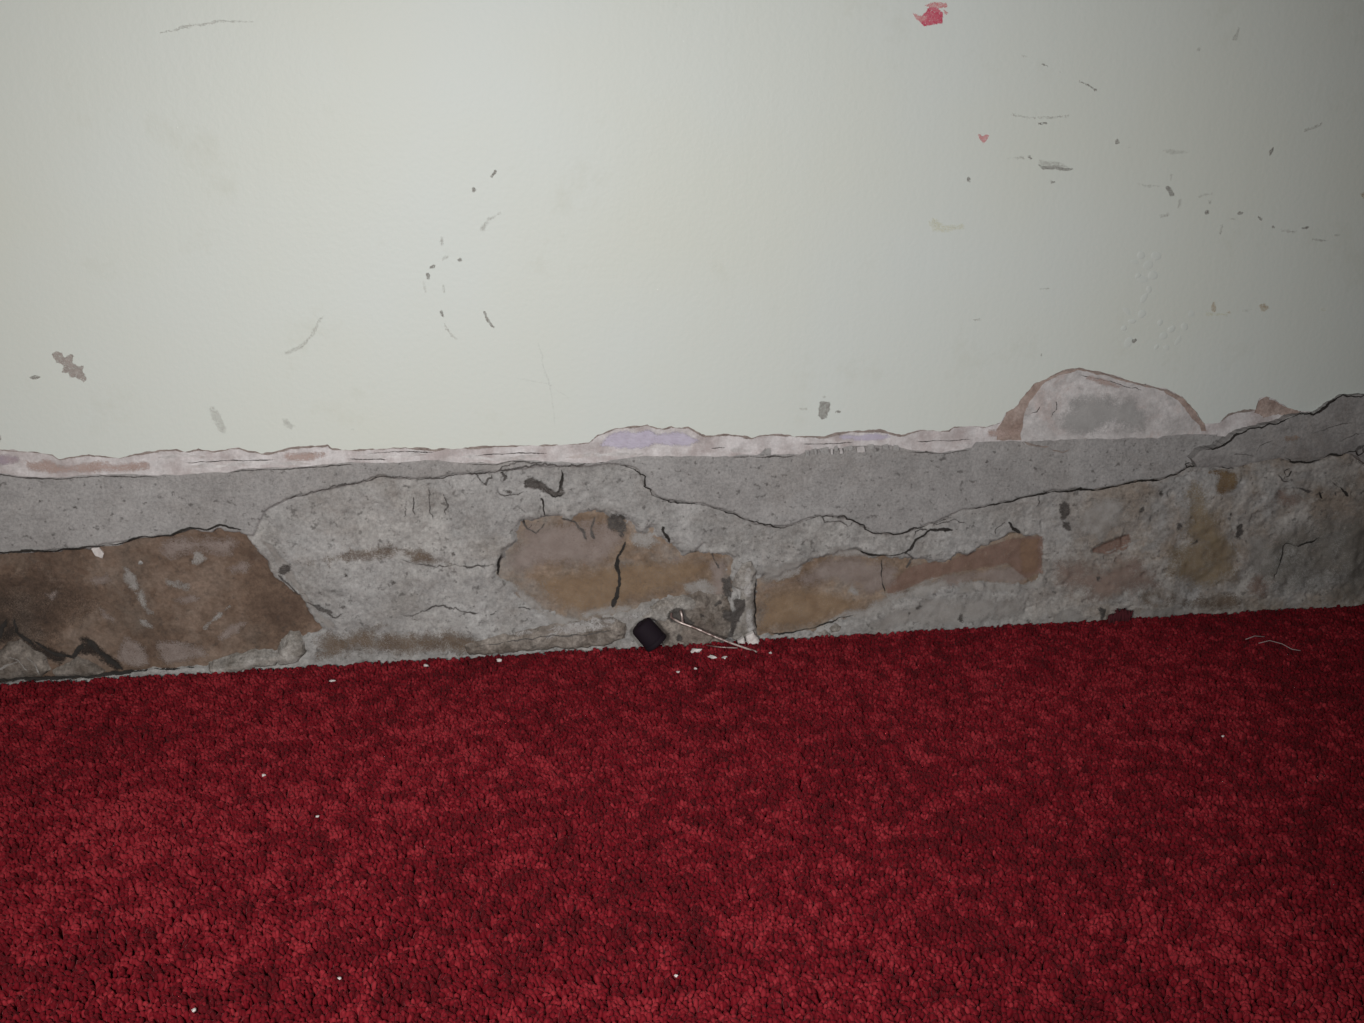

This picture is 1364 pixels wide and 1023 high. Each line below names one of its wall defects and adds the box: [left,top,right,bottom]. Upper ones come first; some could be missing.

spalling [0,524,345,683]
crack [401,559,492,569]
crack [611,542,626,608]
peeling [0,368,1310,498]
spalling [464,510,1046,655]
crack [265,394,1364,553]
spalling [1059,501,1071,531]